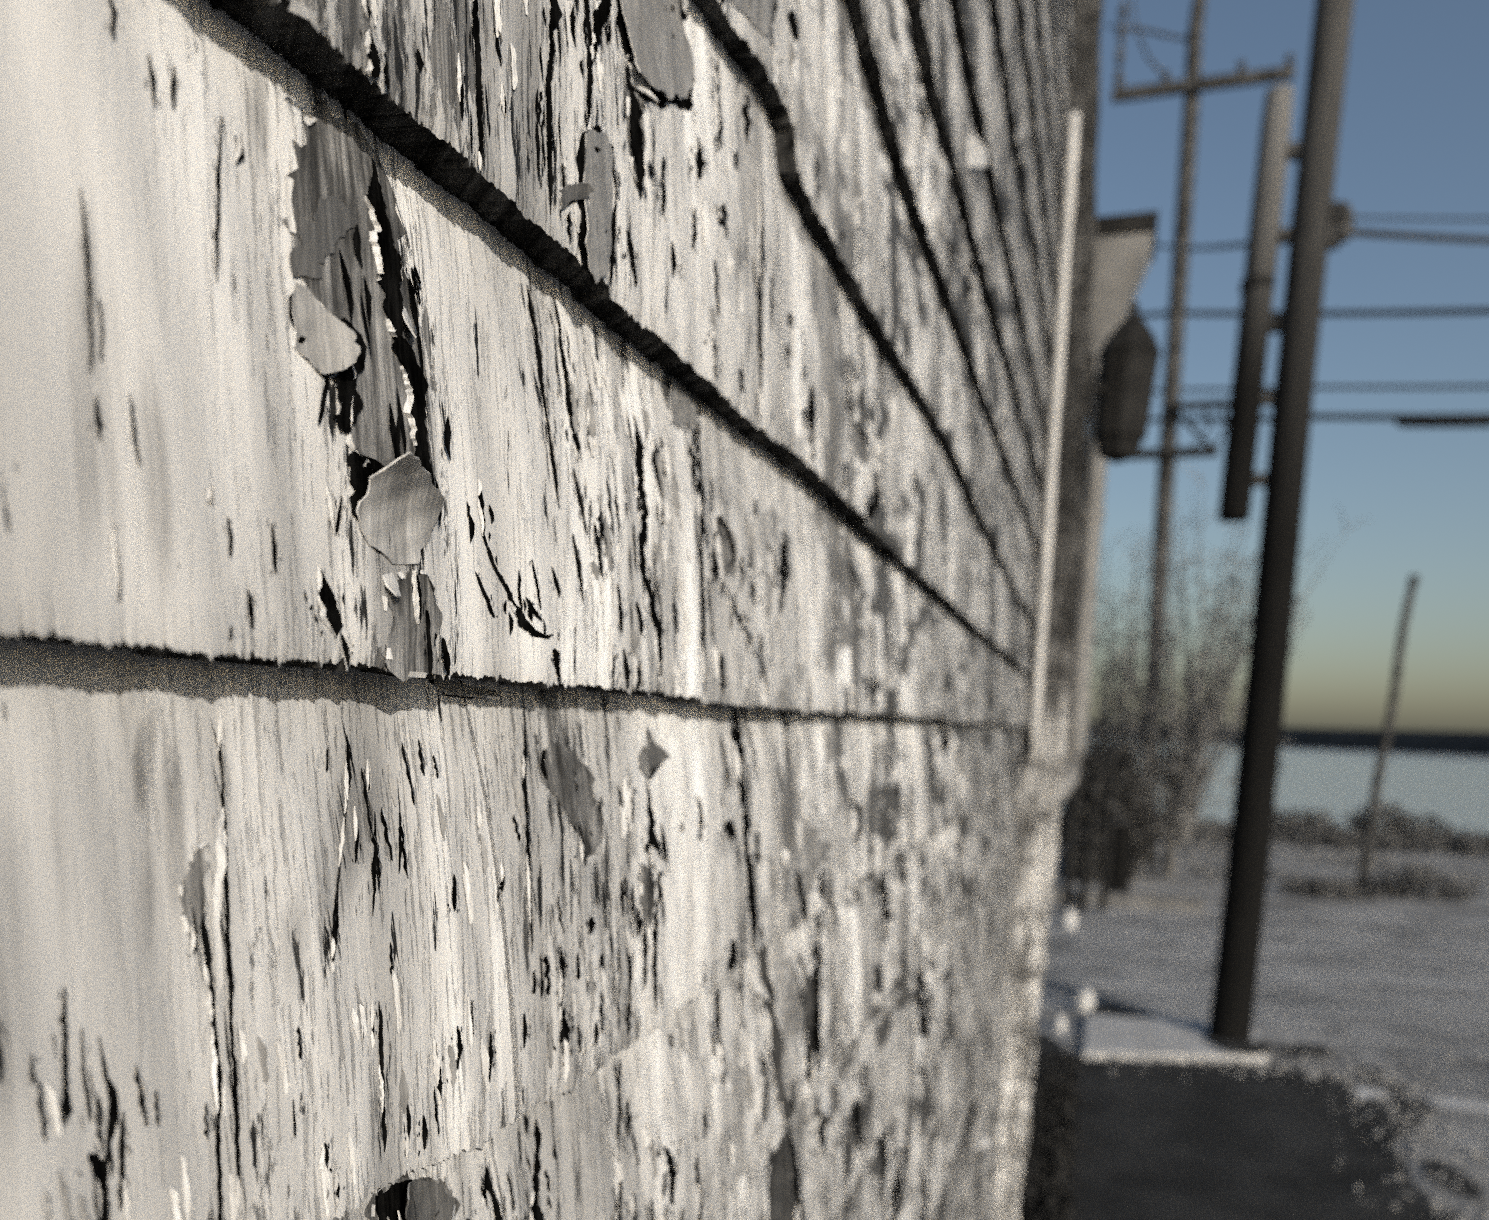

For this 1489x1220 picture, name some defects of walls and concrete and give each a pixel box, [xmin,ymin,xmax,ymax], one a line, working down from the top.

peeling [494,0,518,90]
peeling [559,0,695,285]
peeling [283,99,499,699]
peeling [703,481,836,866]
peeling [361,740,446,879]
peeling [539,729,670,867]
peeling [37,1077,63,1143]
peeling [179,808,303,1140]
peeling [433,994,490,1135]
peeling [548,961,653,1082]
peeling [710,913,851,1220]
peeling [365,1169,461,1220]